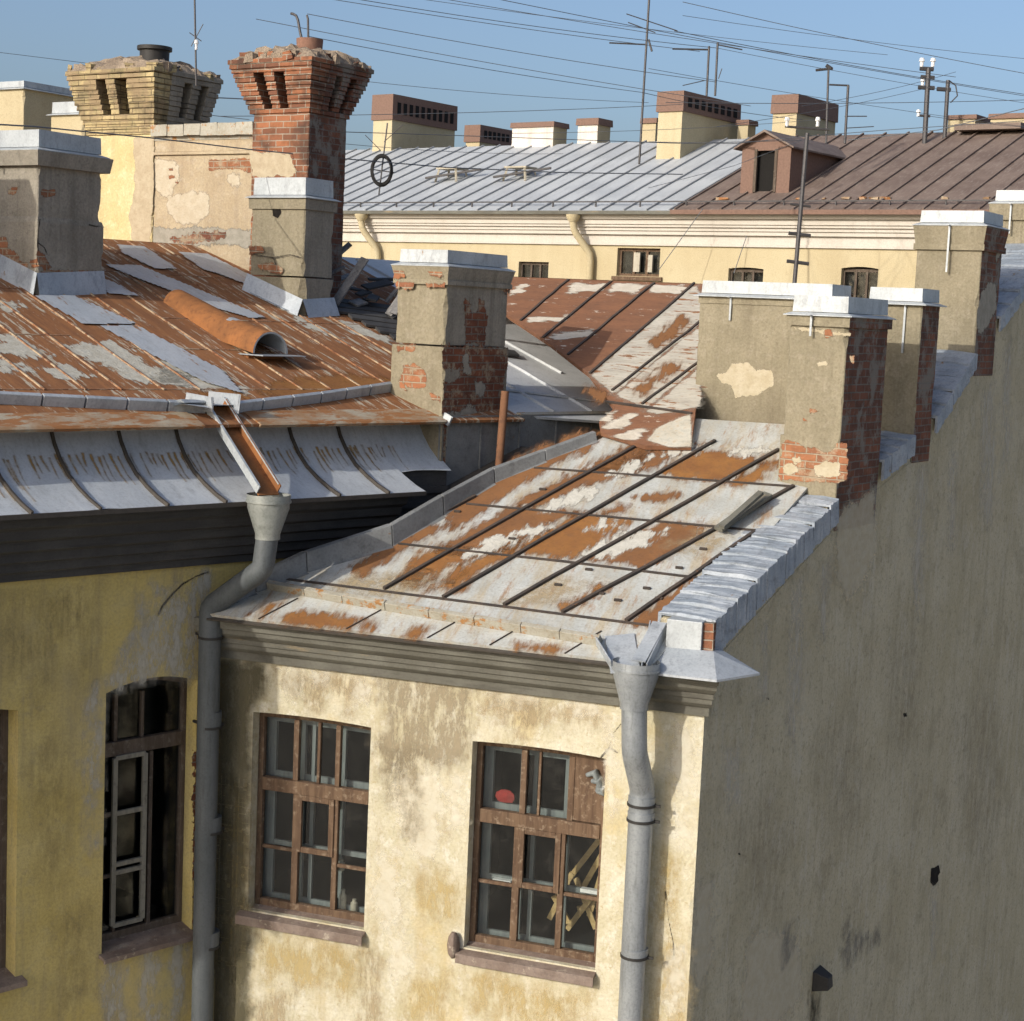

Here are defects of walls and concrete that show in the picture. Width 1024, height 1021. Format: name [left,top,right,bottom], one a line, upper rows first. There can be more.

peeling [128,137,283,274]
corrosion [648,314,689,349]
spalling [285,297,508,463]
corrosion [633,362,681,397]
spalling [728,440,849,483]
peeling [457,486,599,565]
corrosion [349,429,779,594]
peeling [582,517,669,560]
water stain [110,572,211,690]
corrosion [247,603,377,633]
water stain [379,680,468,792]
water stain [484,696,598,724]